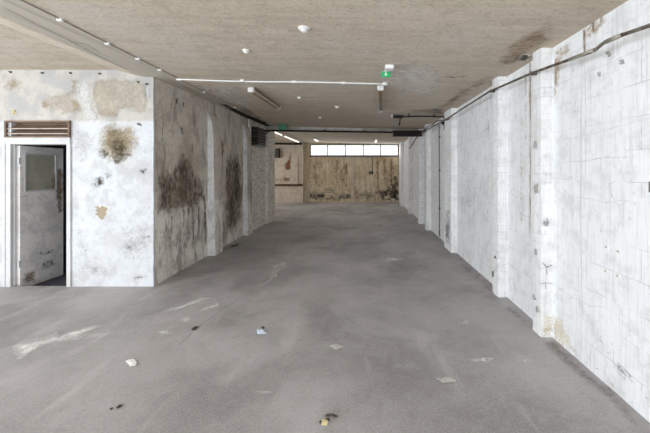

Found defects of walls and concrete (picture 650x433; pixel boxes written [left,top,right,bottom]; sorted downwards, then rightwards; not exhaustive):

peeling [93,79,147,116]
water stain [99,126,137,163]
flaking render [94,205,109,220]
water stain [159,159,206,240]
water stain [226,160,241,234]